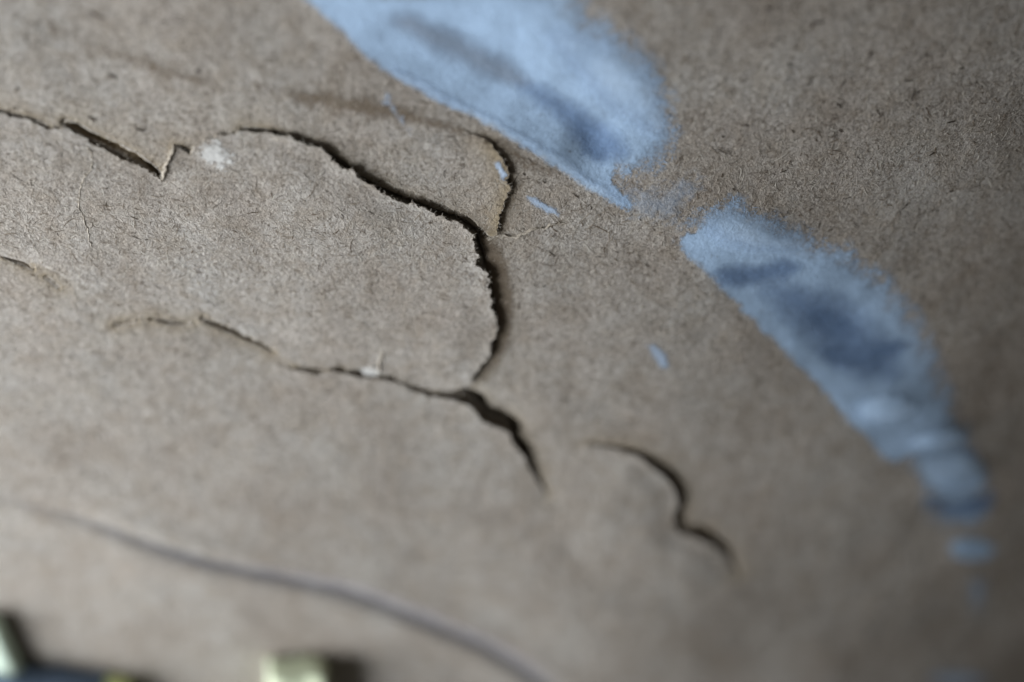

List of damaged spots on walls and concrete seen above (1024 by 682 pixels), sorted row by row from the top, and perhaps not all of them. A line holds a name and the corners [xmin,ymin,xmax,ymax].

crack [0,109,162,177]
crack [2,256,61,289]
crack [114,317,274,353]
crack [243,127,549,495]
crack [591,442,742,577]